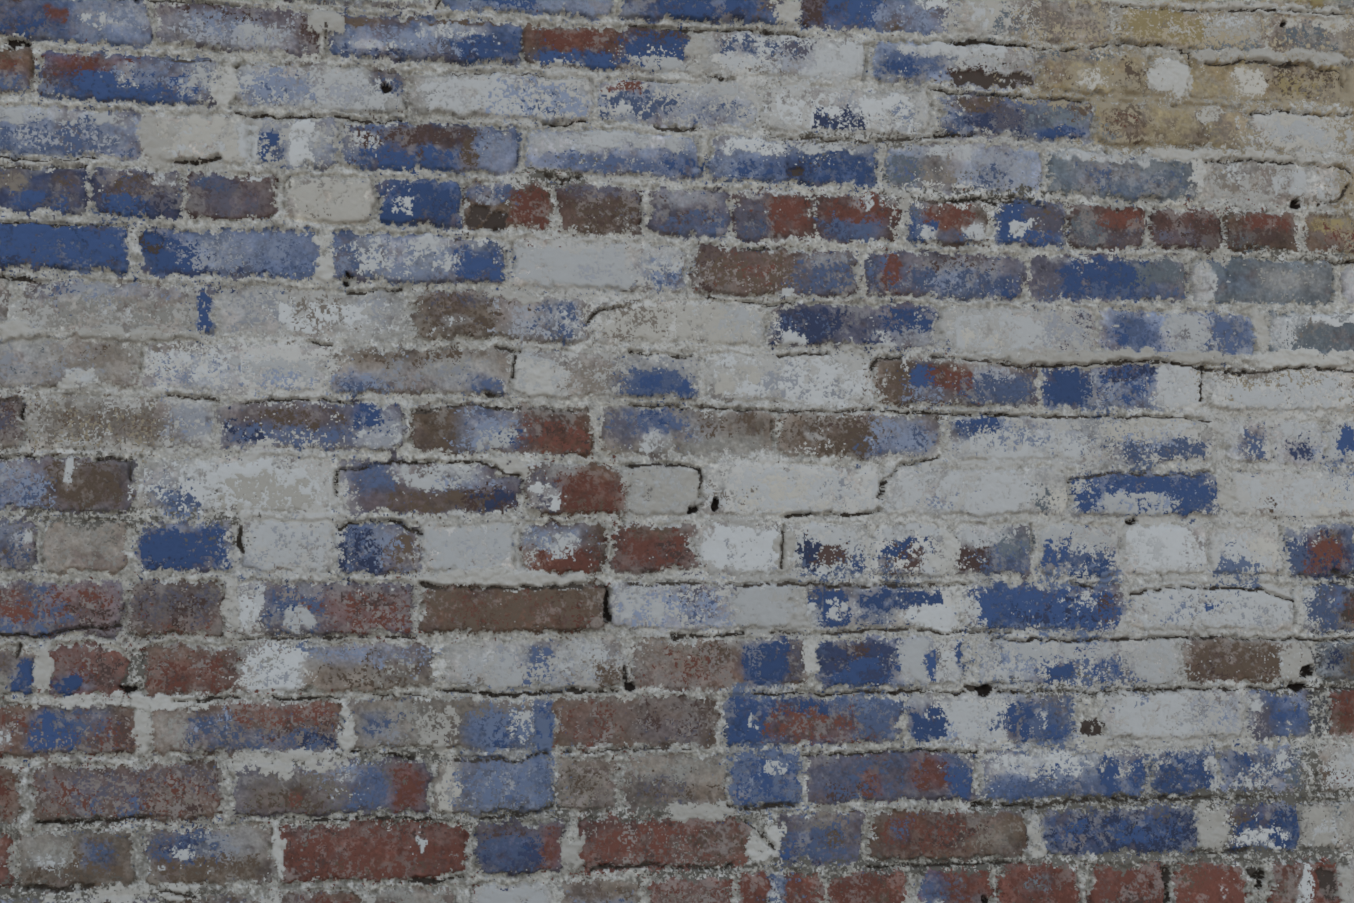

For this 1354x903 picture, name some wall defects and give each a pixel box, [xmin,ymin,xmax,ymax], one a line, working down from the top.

flaking render [905,141,985,240]
flaking render [0,158,997,903]
flaking render [1184,633,1313,693]